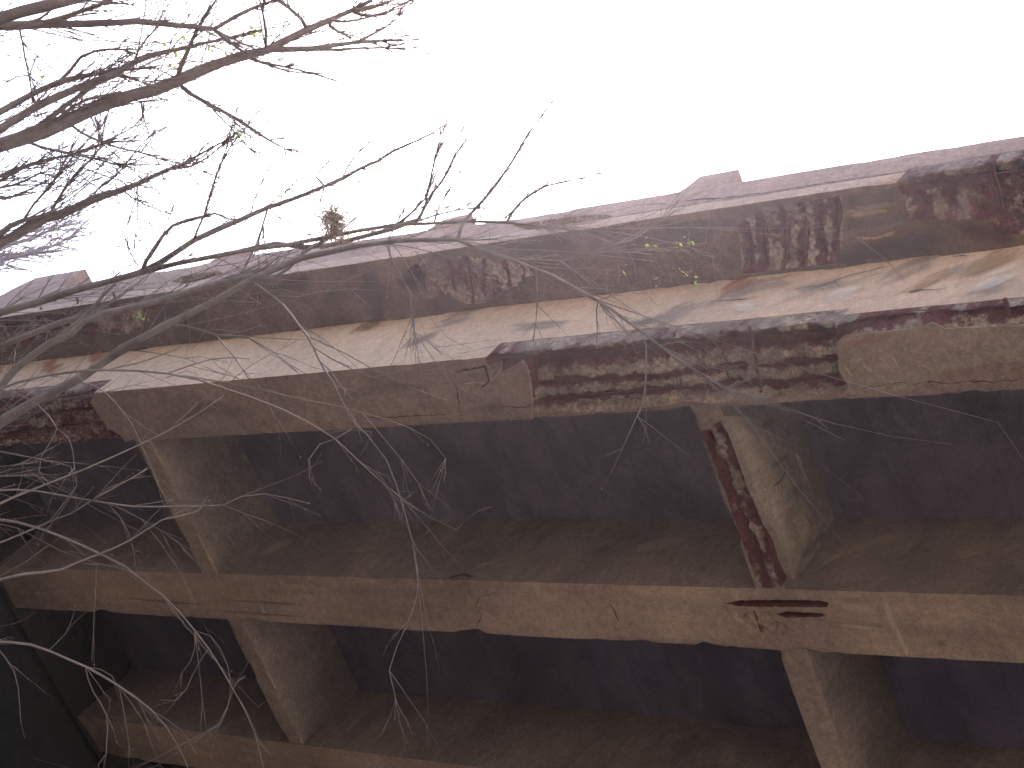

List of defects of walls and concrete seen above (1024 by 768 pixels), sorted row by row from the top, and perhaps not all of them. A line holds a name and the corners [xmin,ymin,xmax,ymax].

spalling [737,149,1024,274]
spalling [406,255,534,304]
spalling [0,381,124,447]
crack [367,343,505,418]
spalling [459,297,1024,422]
crack [863,378,1023,389]
spalling [701,421,829,618]